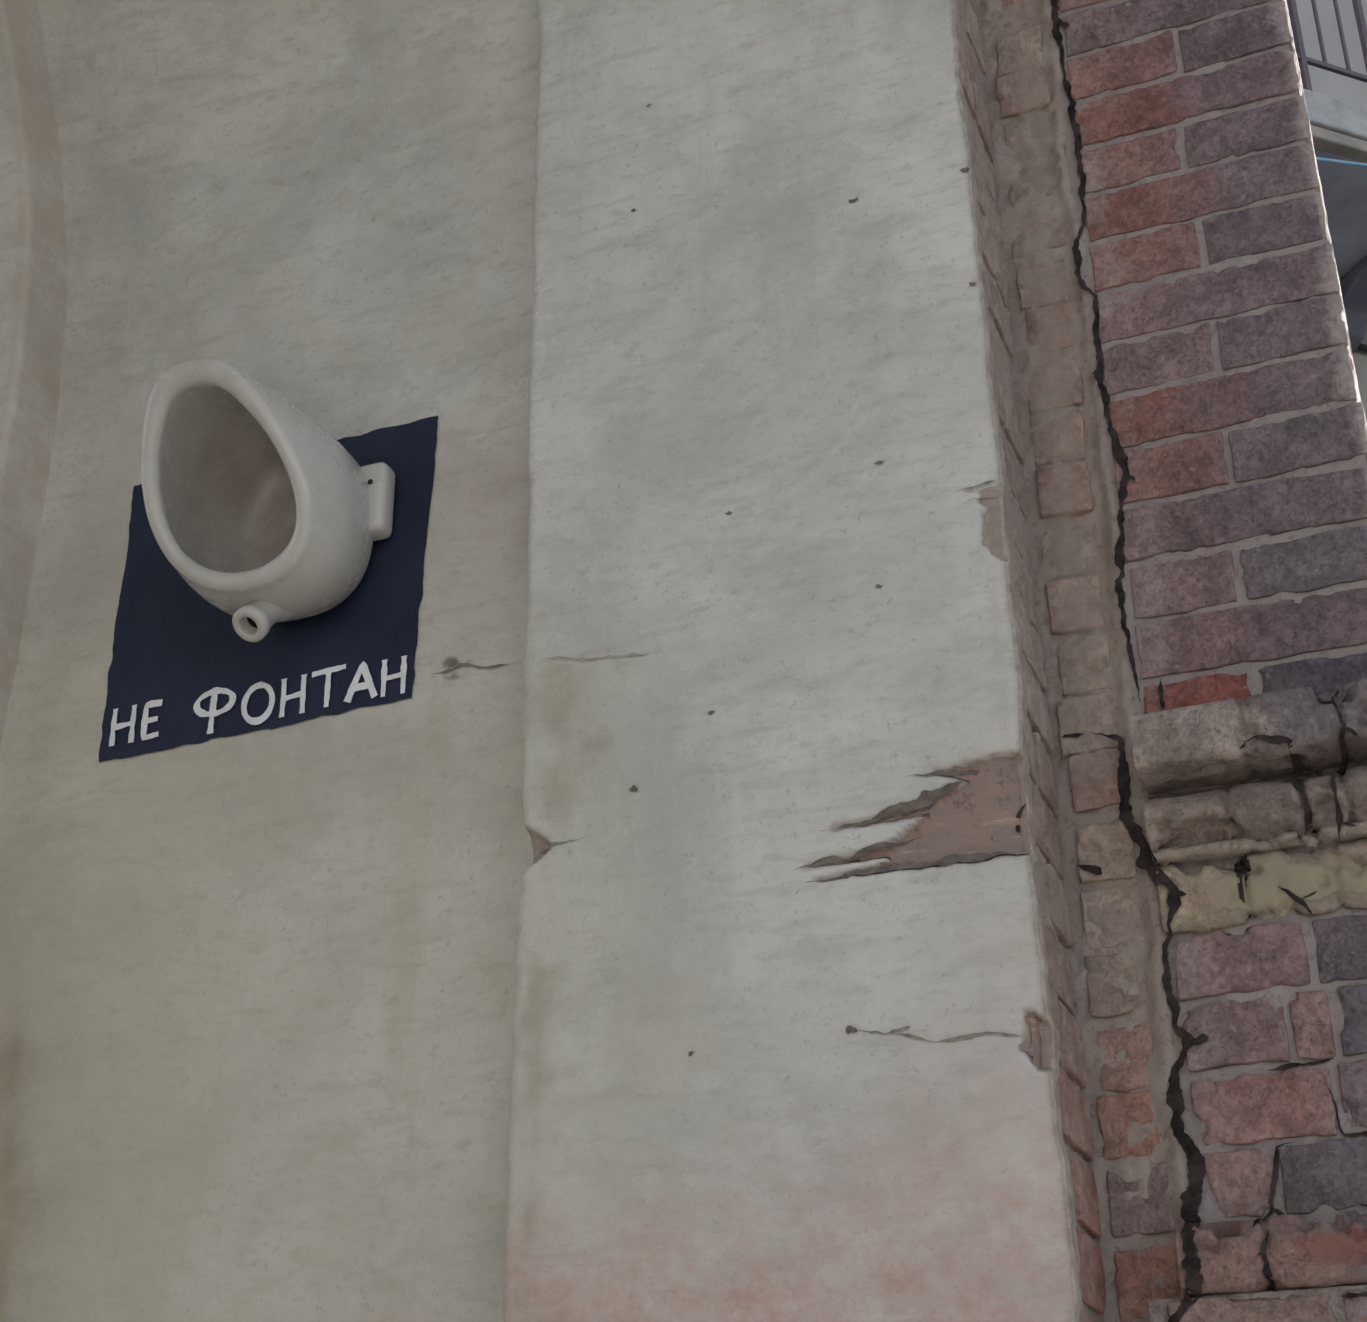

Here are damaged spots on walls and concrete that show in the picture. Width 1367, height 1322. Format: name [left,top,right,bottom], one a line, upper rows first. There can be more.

crack [1051,0,1165,709]
spalling [792,752,1031,883]
crack [1241,691,1358,841]
crack [859,1026,1023,1042]